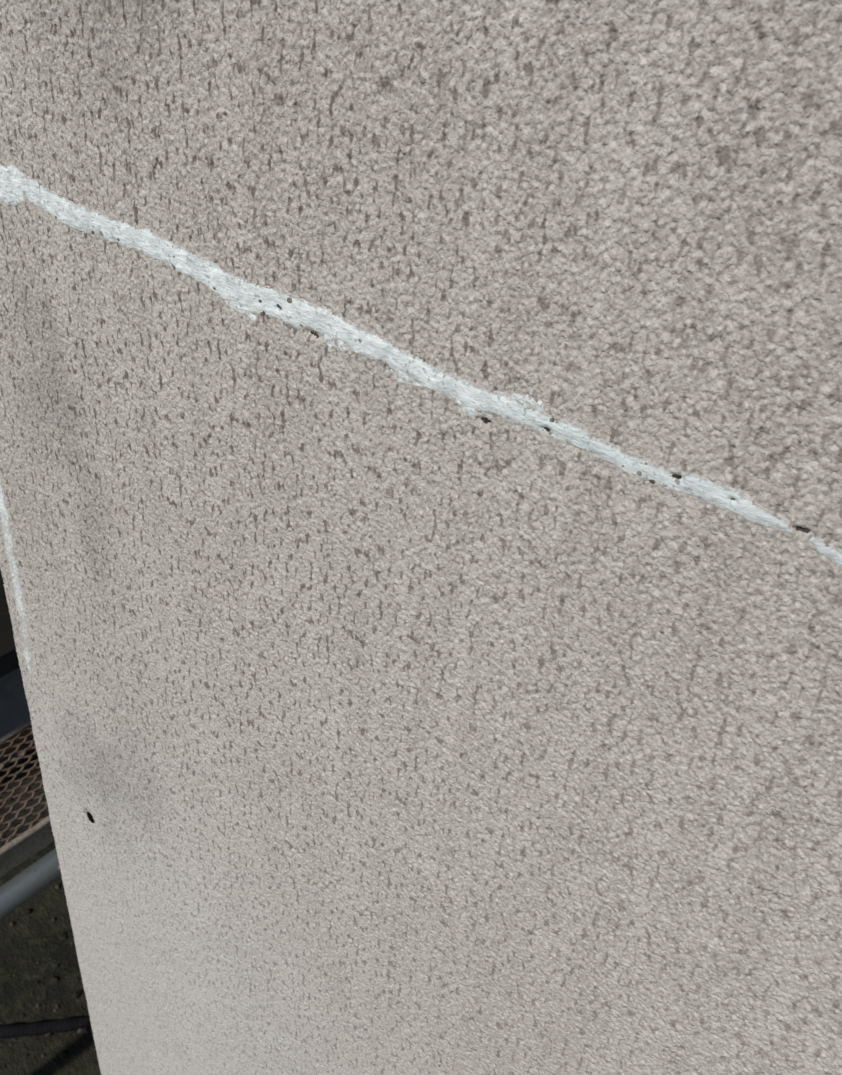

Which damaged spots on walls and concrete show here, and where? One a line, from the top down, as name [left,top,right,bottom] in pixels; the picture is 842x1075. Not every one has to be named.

crack [0,162,842,567]
crack [0,479,33,683]